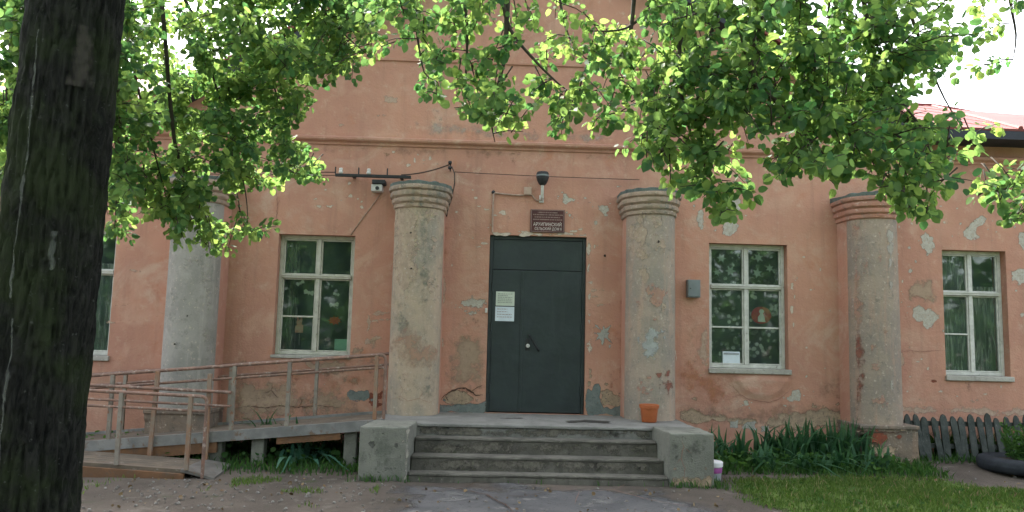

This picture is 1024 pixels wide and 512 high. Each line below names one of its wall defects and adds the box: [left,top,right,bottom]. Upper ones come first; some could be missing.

peeling [952,216,997,240]
peeling [393,208,487,315]
peeling [887,221,945,288]
peeling [1012,268,1024,292]
peeling [901,301,944,332]
flaking render [347,390,383,408]
crack [394,385,482,403]
flaking render [440,390,487,413]
flaking render [585,369,620,416]